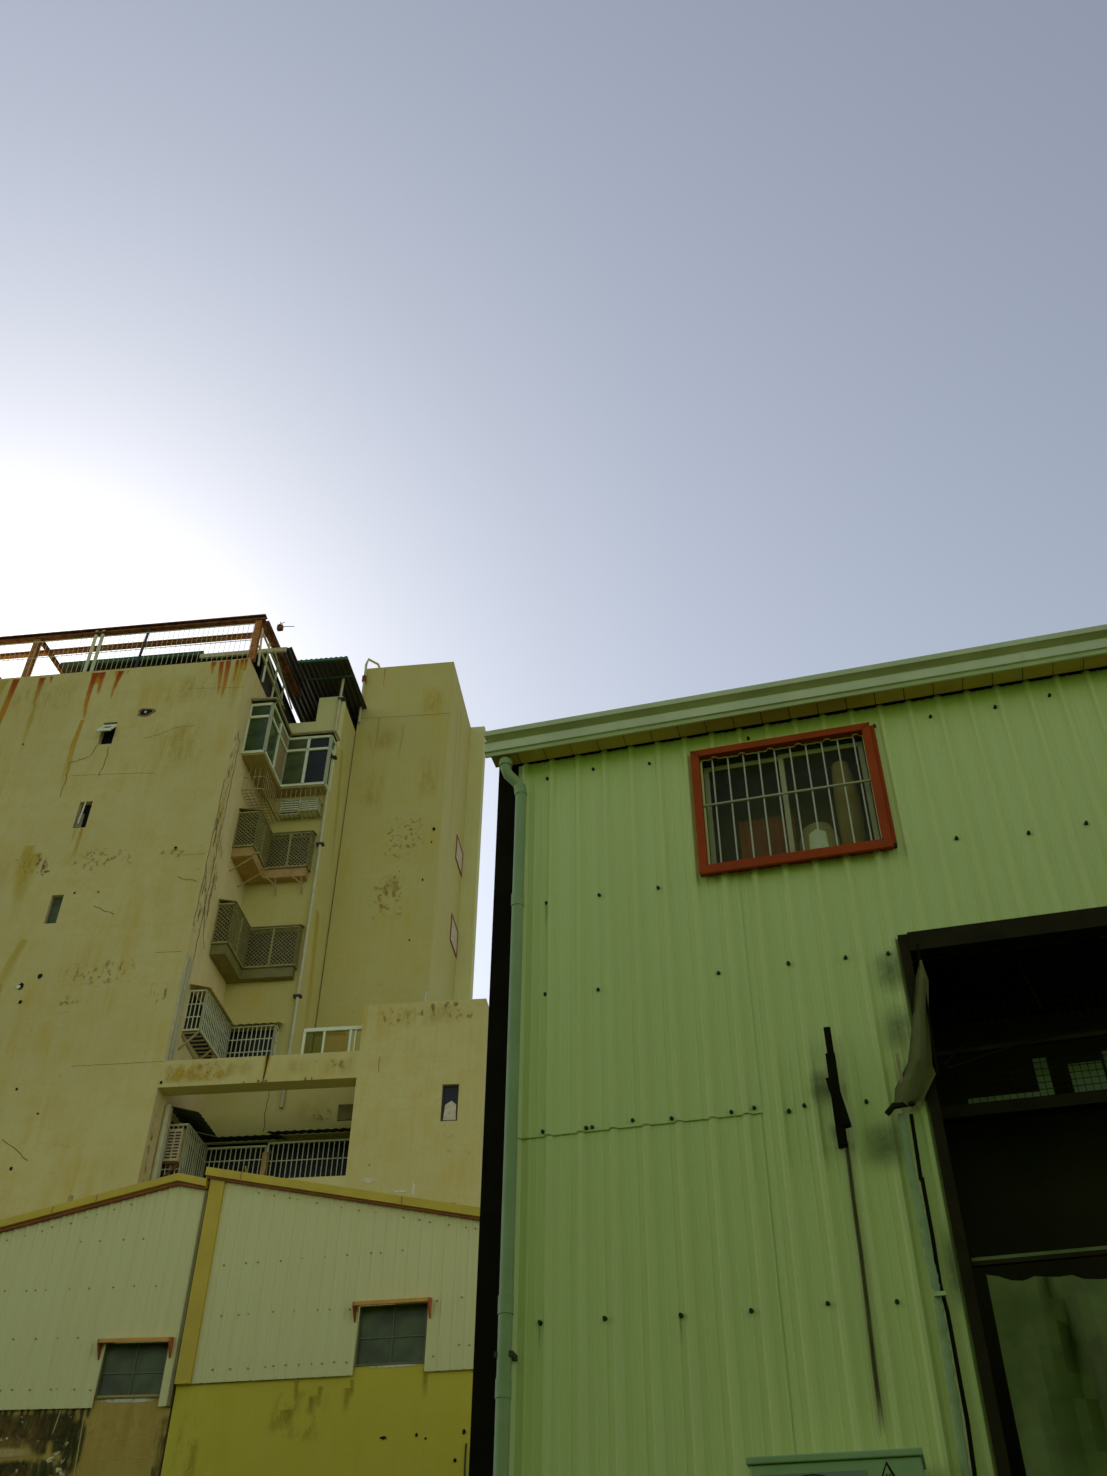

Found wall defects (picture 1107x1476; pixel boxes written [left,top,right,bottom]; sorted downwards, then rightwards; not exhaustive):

rust [0,679,20,722]
rust [26,676,53,731]
rust [67,670,129,766]
rust [211,659,248,694]
damp [0,1408,90,1476]